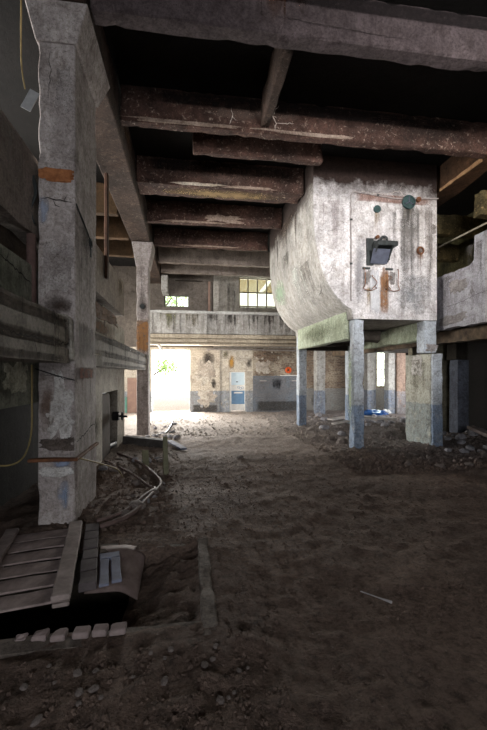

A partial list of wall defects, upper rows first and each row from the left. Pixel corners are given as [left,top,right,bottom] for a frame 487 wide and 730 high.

rust [381,268,389,309]
peeling [2,362,28,394]
flaking render [192,358,219,408]
flaking render [254,348,281,374]